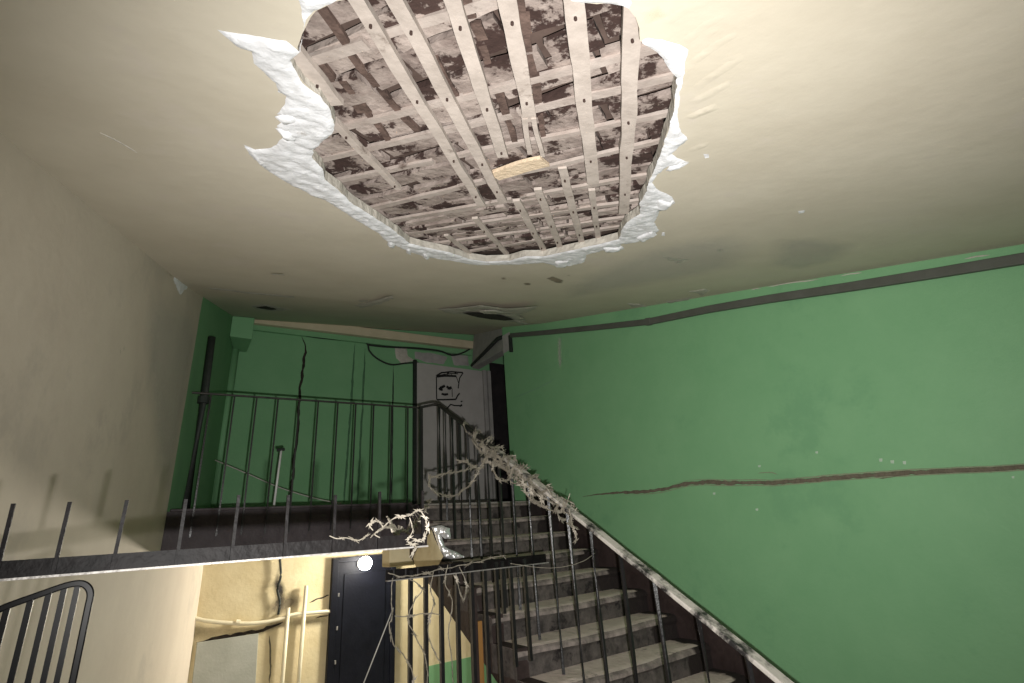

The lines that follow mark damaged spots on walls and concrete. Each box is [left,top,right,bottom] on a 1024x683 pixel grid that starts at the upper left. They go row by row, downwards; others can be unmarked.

flaking render [218,0,688,268]
crack [290,336,307,495]
crack [583,464,1024,497]
crack [196,622,283,683]